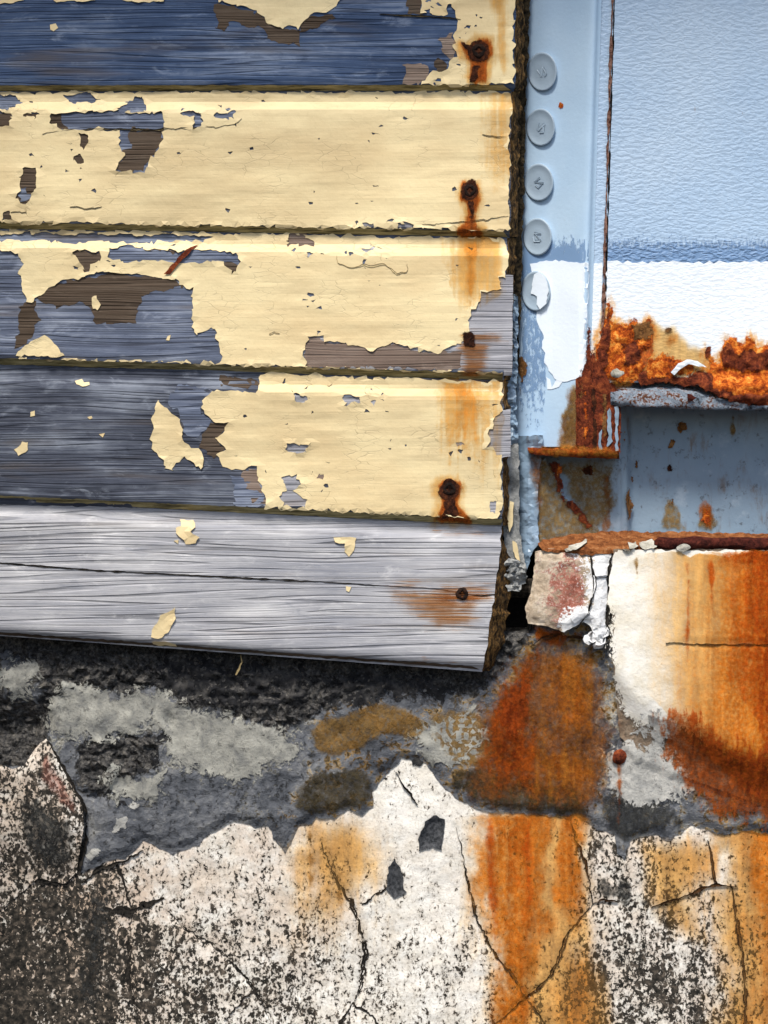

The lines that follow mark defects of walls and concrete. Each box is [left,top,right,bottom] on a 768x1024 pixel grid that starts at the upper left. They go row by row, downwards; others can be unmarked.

peeling [0,0,462,174]
rust [458,179,481,236]
peeling [0,211,266,508]
peeling [303,275,513,376]
rust [566,303,768,453]
rust [438,478,470,522]
rust [654,536,768,562]
spalling [0,548,768,910]
crack [39,735,271,1024]
crack [321,843,386,1024]
crack [456,822,617,1024]
crack [651,840,748,1024]